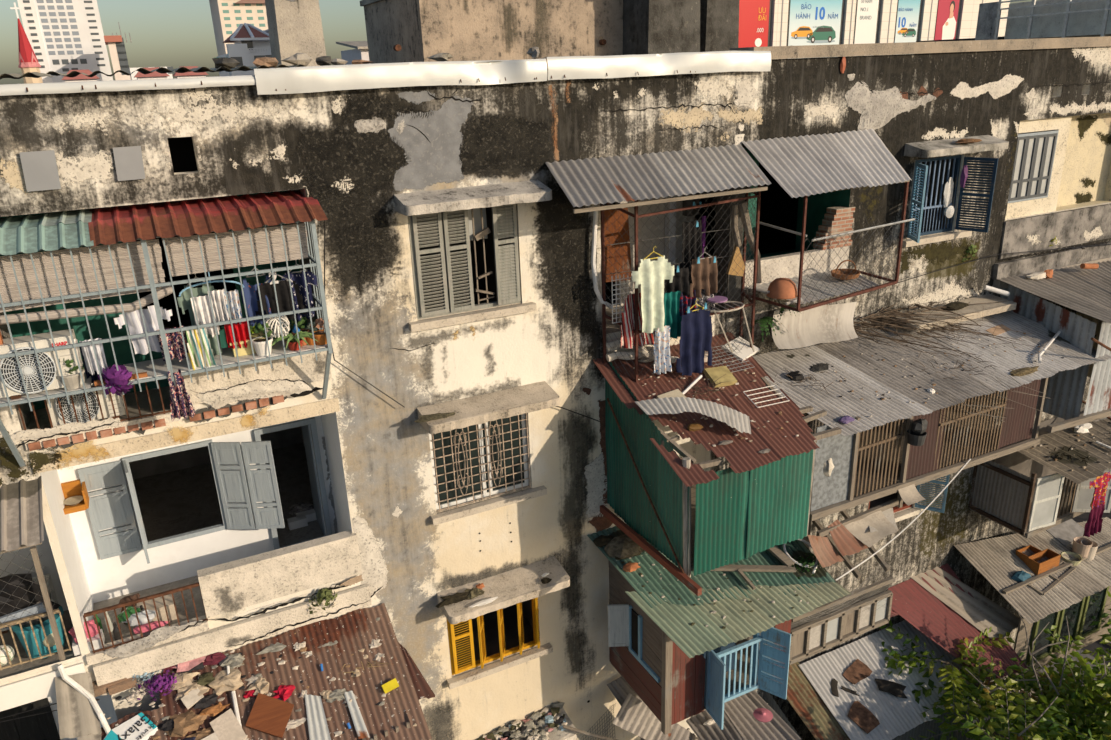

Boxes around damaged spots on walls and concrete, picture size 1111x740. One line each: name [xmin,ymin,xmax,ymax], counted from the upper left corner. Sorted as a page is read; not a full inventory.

damp [297,94,433,301]
damp [459,113,602,337]
peeling [922,126,968,141]
flaking render [804,74,1111,138]
crack [11,421,120,457]
damp [558,415,597,673]